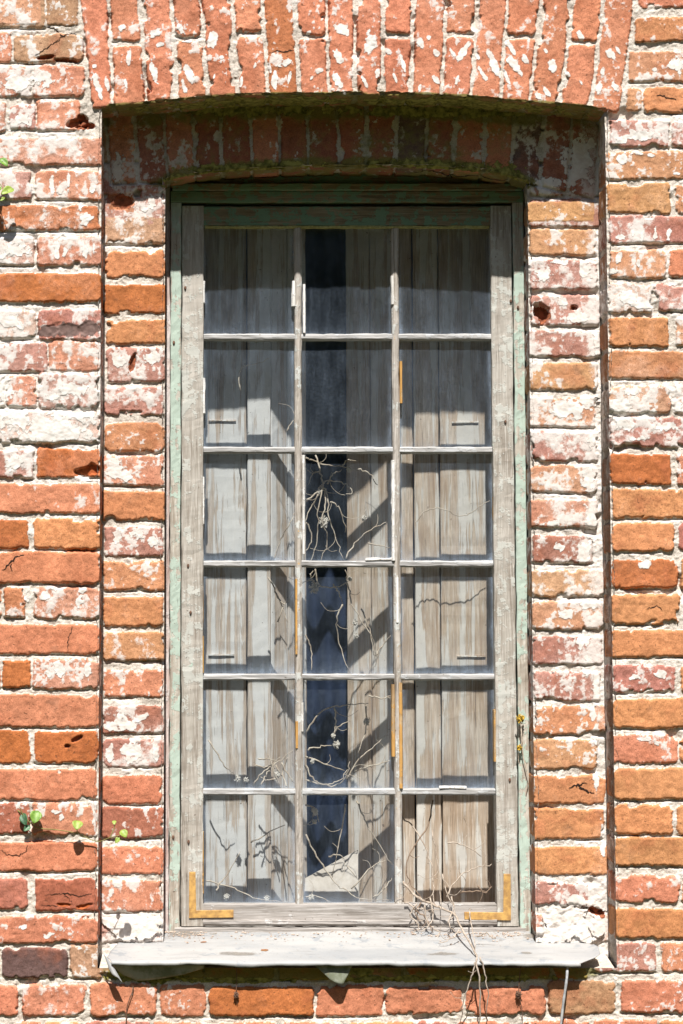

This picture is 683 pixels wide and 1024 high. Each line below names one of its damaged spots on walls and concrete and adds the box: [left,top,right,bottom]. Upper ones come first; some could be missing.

crack [36,26,76,55]
spalling [69,111,120,130]
peeling [110,152,156,212]
peeling [533,295,600,356]
peeling [74,456,133,483]
crack [569,782,592,794]
spalling [588,906,605,937]